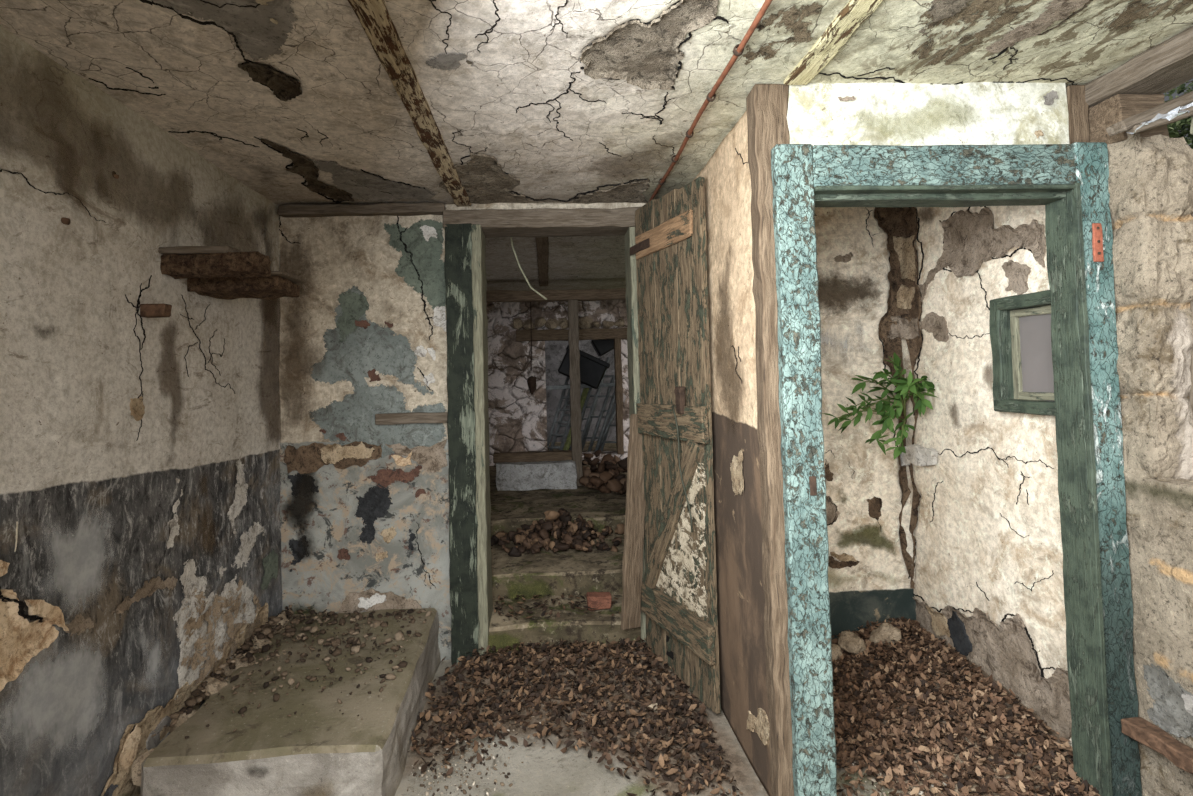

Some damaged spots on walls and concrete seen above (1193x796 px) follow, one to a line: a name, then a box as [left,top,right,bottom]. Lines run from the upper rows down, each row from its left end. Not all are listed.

peeling [140,0,302,102]
crack [550,0,568,36]
spalling [580,0,729,90]
crack [516,71,675,157]
crack [0,169,107,223]
damp [260,299,310,439]
damp [285,473,316,557]
peeling [284,286,448,562]
flaking render [874,206,1072,742]
flaking render [0,560,94,691]
peeling [100,459,308,796]